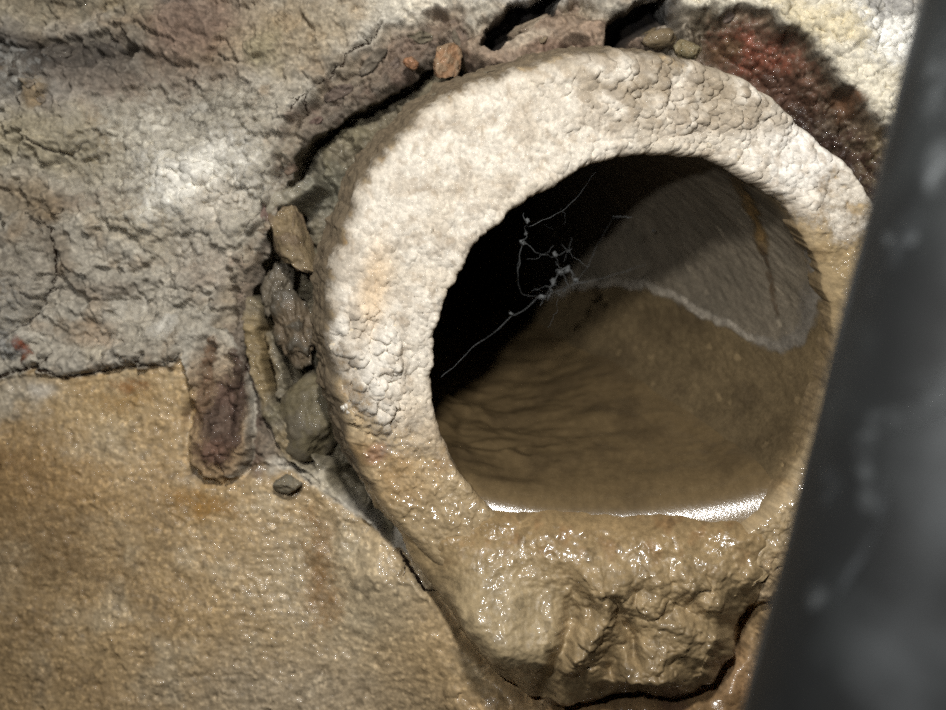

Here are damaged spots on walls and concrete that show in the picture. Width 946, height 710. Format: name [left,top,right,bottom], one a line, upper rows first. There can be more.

crack [1,209,68,340]
crack [0,353,179,379]
spalling [200,0,640,354]
spalling [628,0,888,198]
corrosion [705,14,880,199]
damp [398,510,766,710]